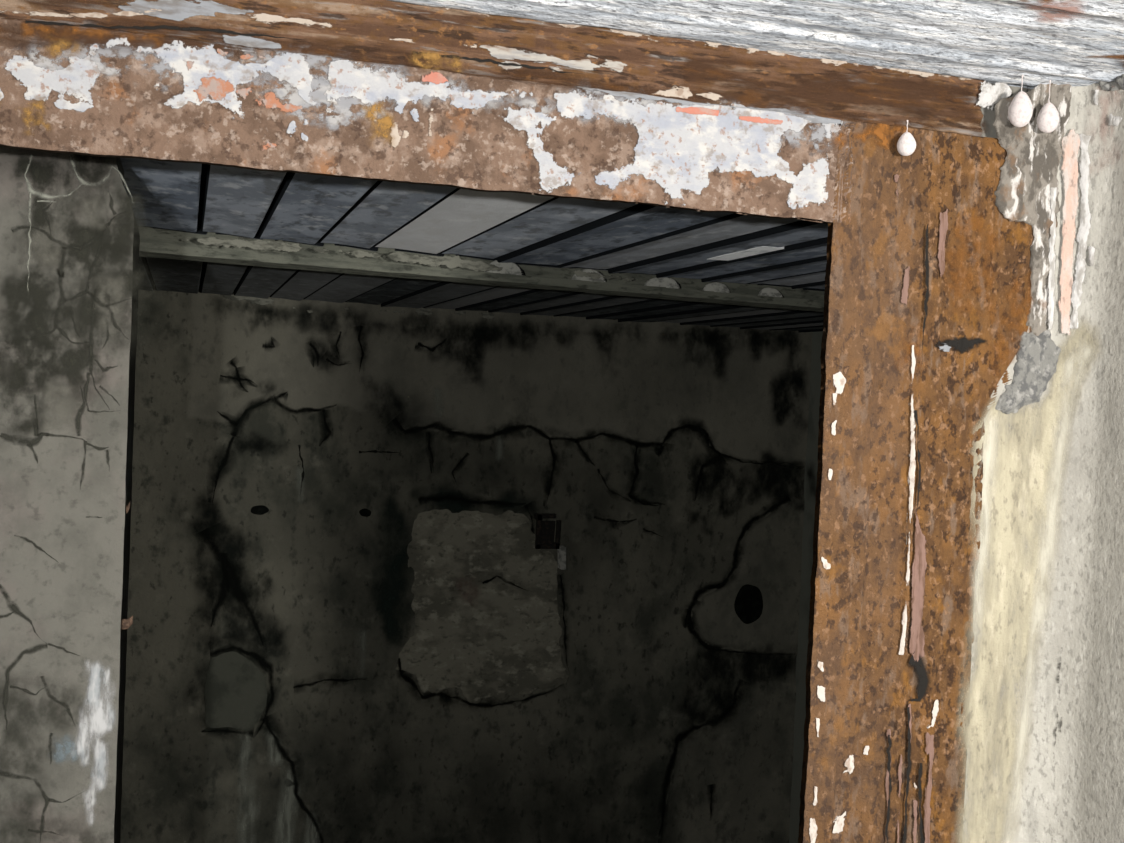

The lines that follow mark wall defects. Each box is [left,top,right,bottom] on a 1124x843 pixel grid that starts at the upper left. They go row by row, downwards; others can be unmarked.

rust [0,18,440,69]
rust [364,104,394,138]
peeling [4,35,843,209]
rust [491,59,983,148]
crack [0,195,132,489]
leakage [218,293,365,333]
leakage [380,307,535,379]
spalling [974,81,1080,414]
leakage [960,134,1095,843]
crack [201,359,365,843]
flaking render [396,509,569,704]
crack [0,585,84,841]